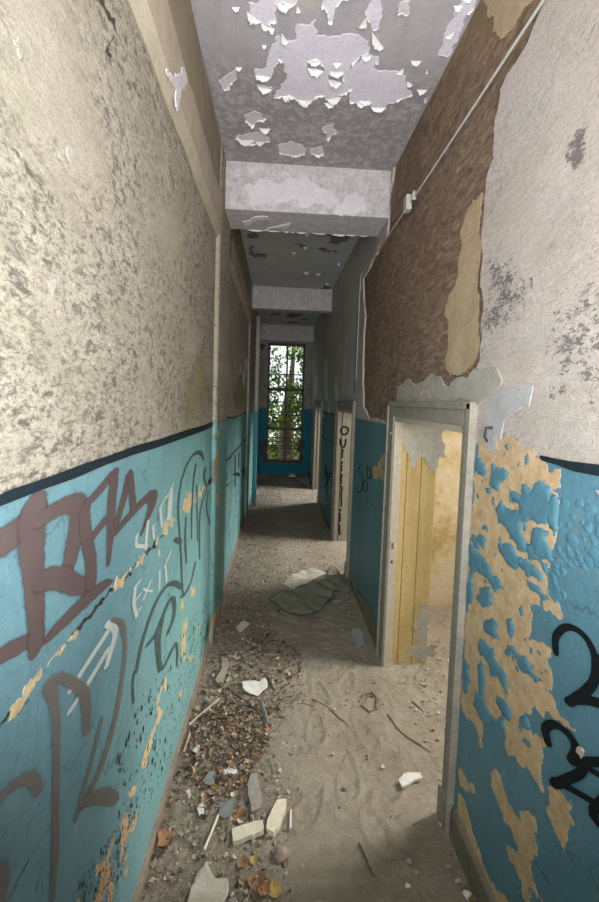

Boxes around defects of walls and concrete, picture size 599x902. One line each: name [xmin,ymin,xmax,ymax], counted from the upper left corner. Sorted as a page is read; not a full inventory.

peeling [165,67,187,111]
peeling [218,67,242,91]
flaking render [232,0,542,420]
flaking render [155,430,242,546]
peeling [402,423,447,473]
flaking render [113,552,145,592]
flaking render [9,631,79,721]
peeling [402,603,437,663]
peeling [460,436,576,851]
peeling [75,586,224,902]
peeling [457,768,509,902]
peeling [491,769,543,902]